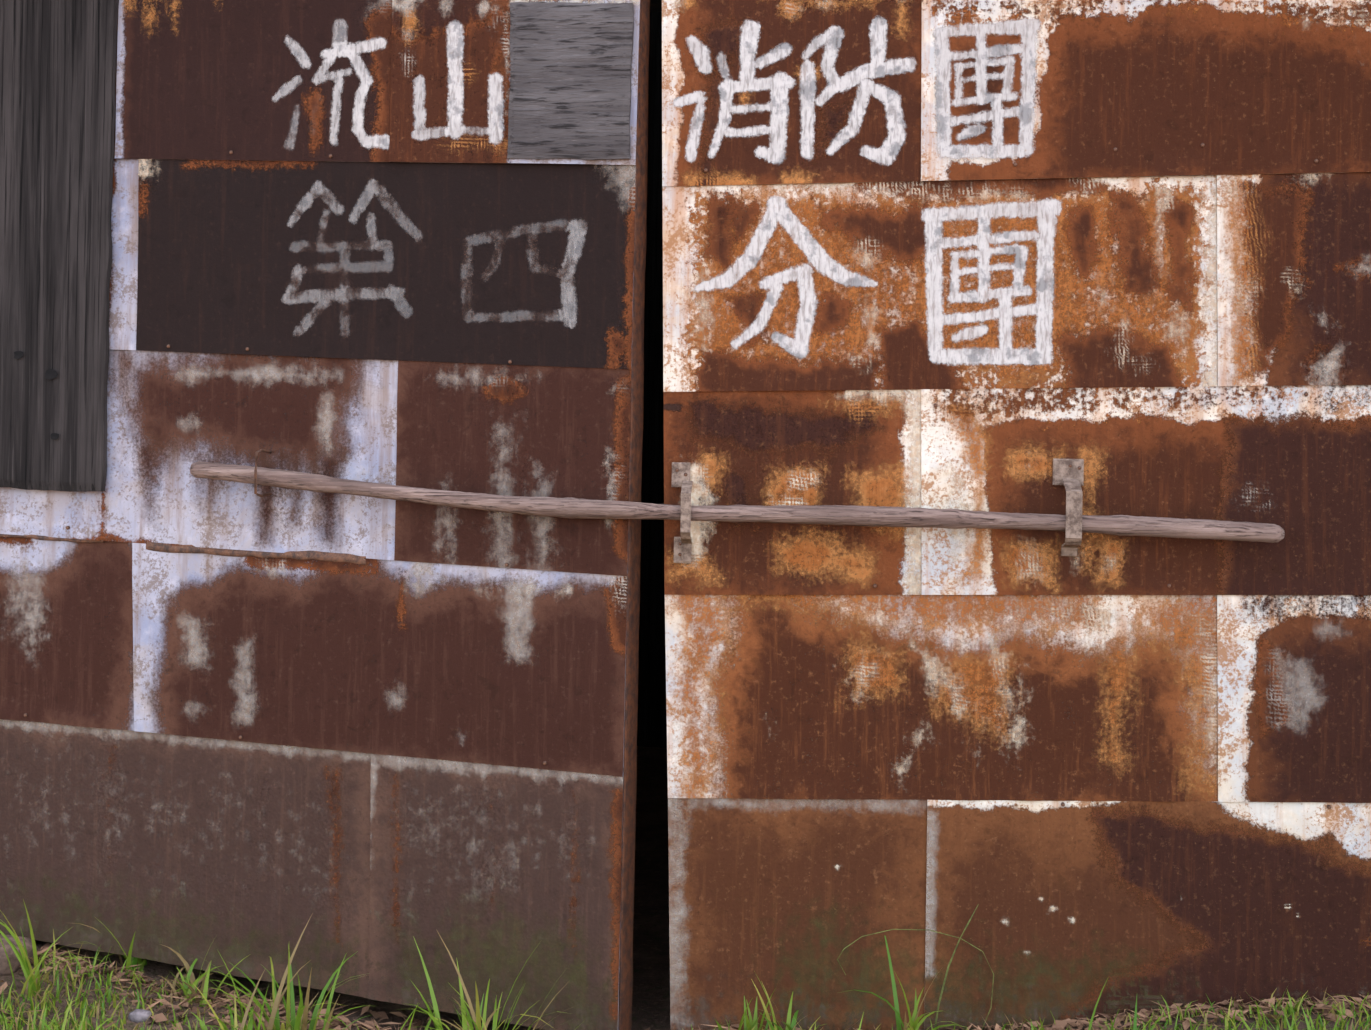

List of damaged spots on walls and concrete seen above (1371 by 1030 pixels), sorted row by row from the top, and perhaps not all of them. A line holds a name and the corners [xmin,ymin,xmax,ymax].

corrosion [0,0,640,1030]
corrosion [663,0,1371,1030]